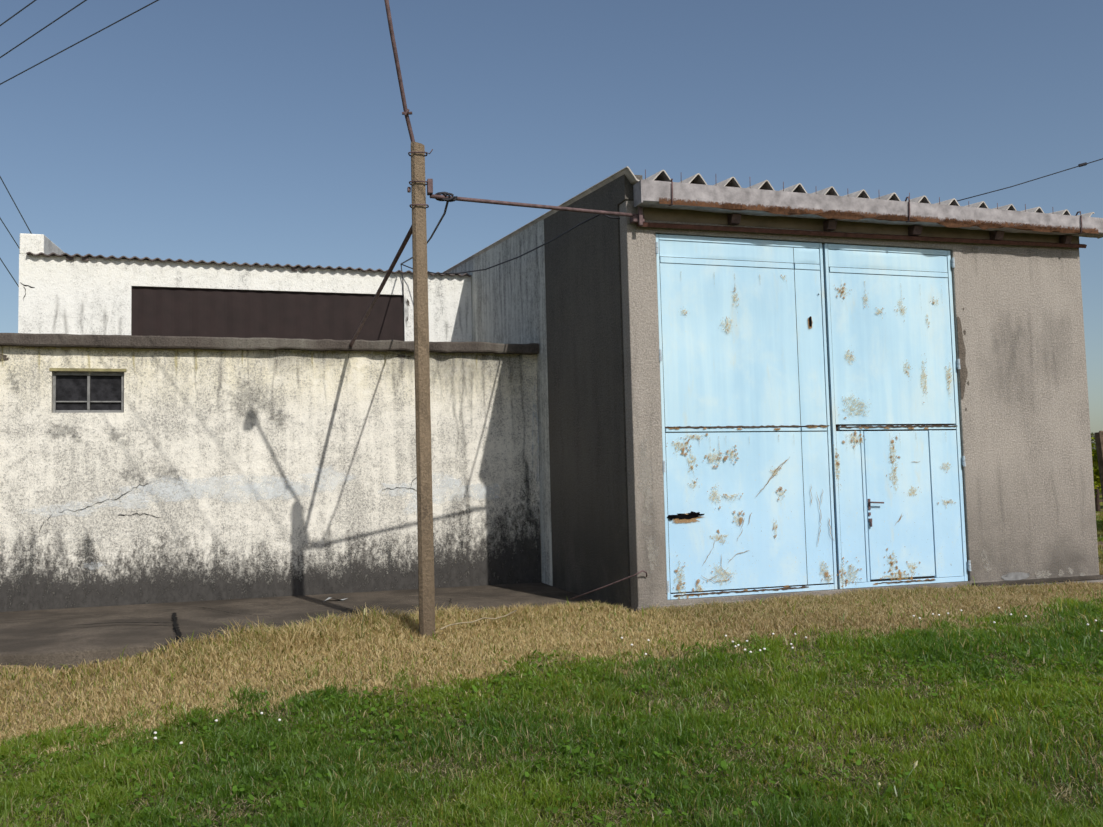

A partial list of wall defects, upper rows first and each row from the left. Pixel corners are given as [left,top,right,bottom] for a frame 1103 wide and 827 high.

corrosion [665,396,957,509]
crack [39,483,161,532]
leakage [433,494,542,588]
peeling [669,511,703,523]
leakage [0,532,418,612]
corrosion [673,562,808,599]
corrosion [820,548,935,587]